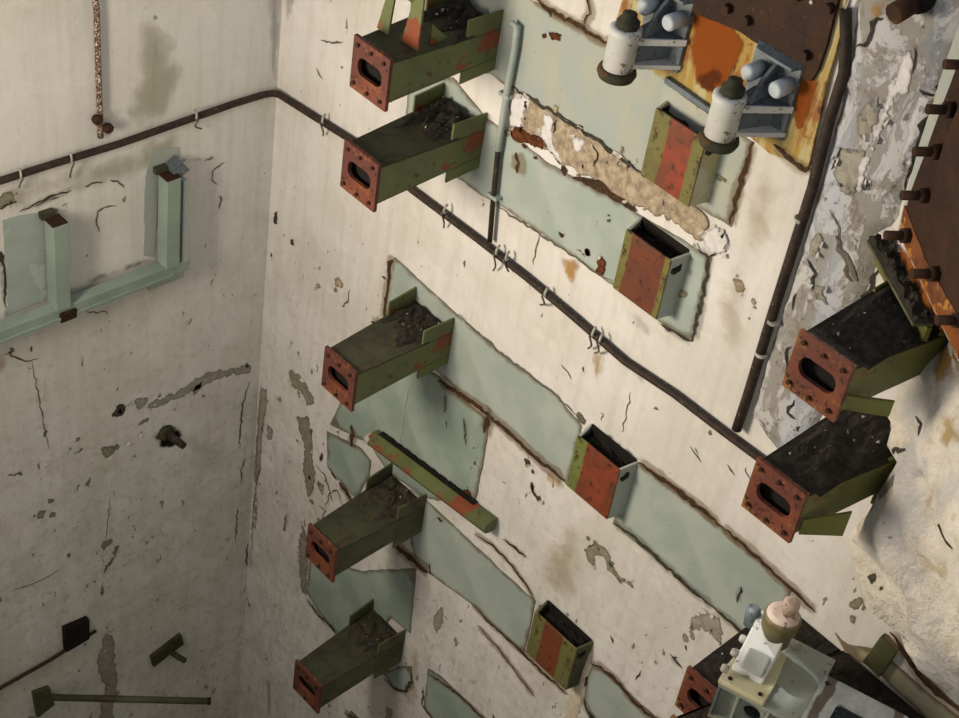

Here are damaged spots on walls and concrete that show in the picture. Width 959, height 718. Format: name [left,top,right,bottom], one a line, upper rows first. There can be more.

corrosion [690,13,743,92]
spalling [505,86,728,259]
corrosion [793,78,827,129]
peeling [832,51,936,203]
crack [0,251,8,307]
spalling [575,248,606,276]
peeling [101,362,251,459]
peeling [252,388,272,529]
peeling [286,370,324,504]
peeling [584,536,633,588]
spalling [97,625,119,718]
peeling [682,608,723,645]